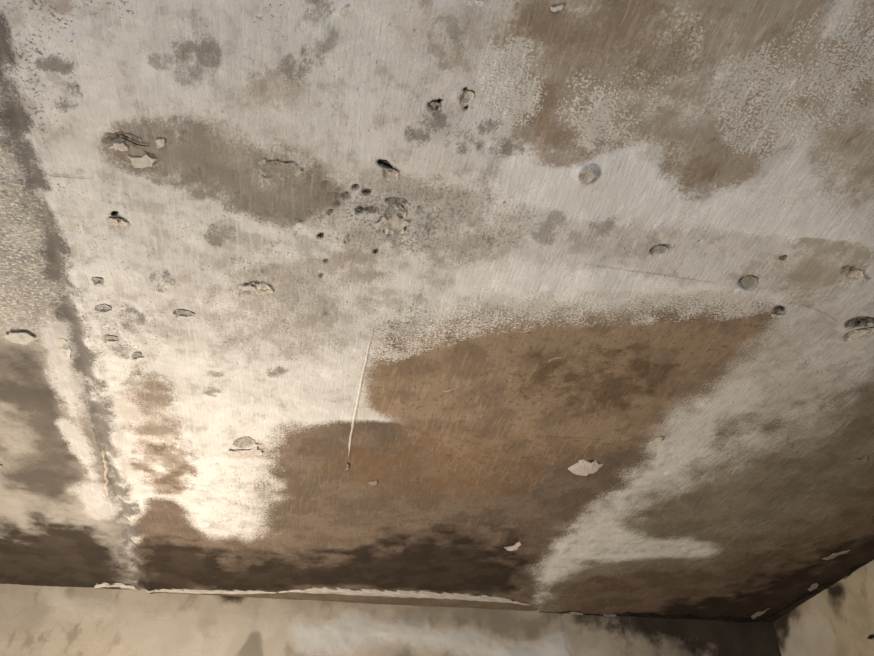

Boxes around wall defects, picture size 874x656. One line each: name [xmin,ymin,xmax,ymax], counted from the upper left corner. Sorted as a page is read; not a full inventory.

leakage [35,54,83,113]
leakage [148,35,220,85]
leakage [405,0,874,191]
spalling [101,132,165,169]
leakage [101,117,349,228]
spalling [322,180,371,215]
spalling [355,197,410,236]
spalling [844,317,874,342]
leakage [0,353,76,498]
leakage [120,291,874,656]
peeling [568,460,603,476]
leakage [0,514,122,589]